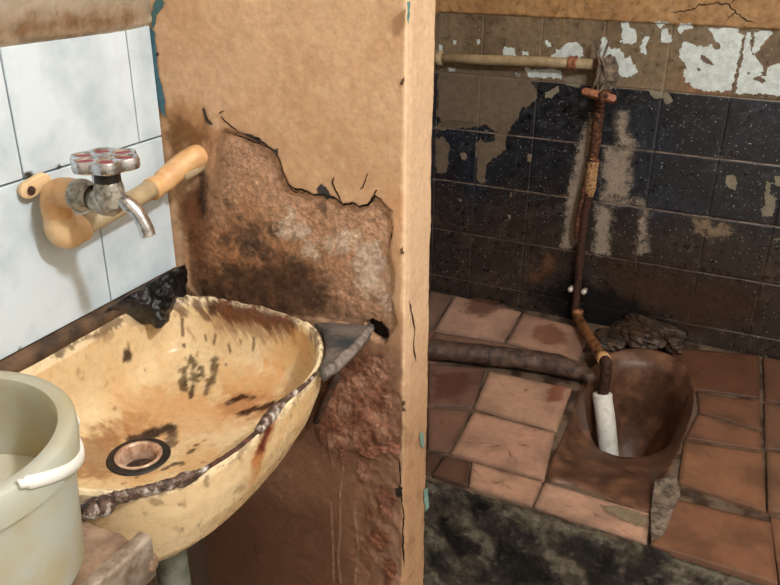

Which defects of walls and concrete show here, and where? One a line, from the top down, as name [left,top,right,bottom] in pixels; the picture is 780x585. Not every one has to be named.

peeling [545,40,584,58]
peeling [599,21,650,78]
crack [675,0,757,24]
peeling [655,21,780,97]
peeling [435,67,582,184]
damp [202,263,329,311]
peeling [191,130,392,328]
damp [274,210,393,317]
damp [560,113,593,249]
damp [592,111,649,256]
peeling [761,176,780,217]
spalling [311,350,406,583]